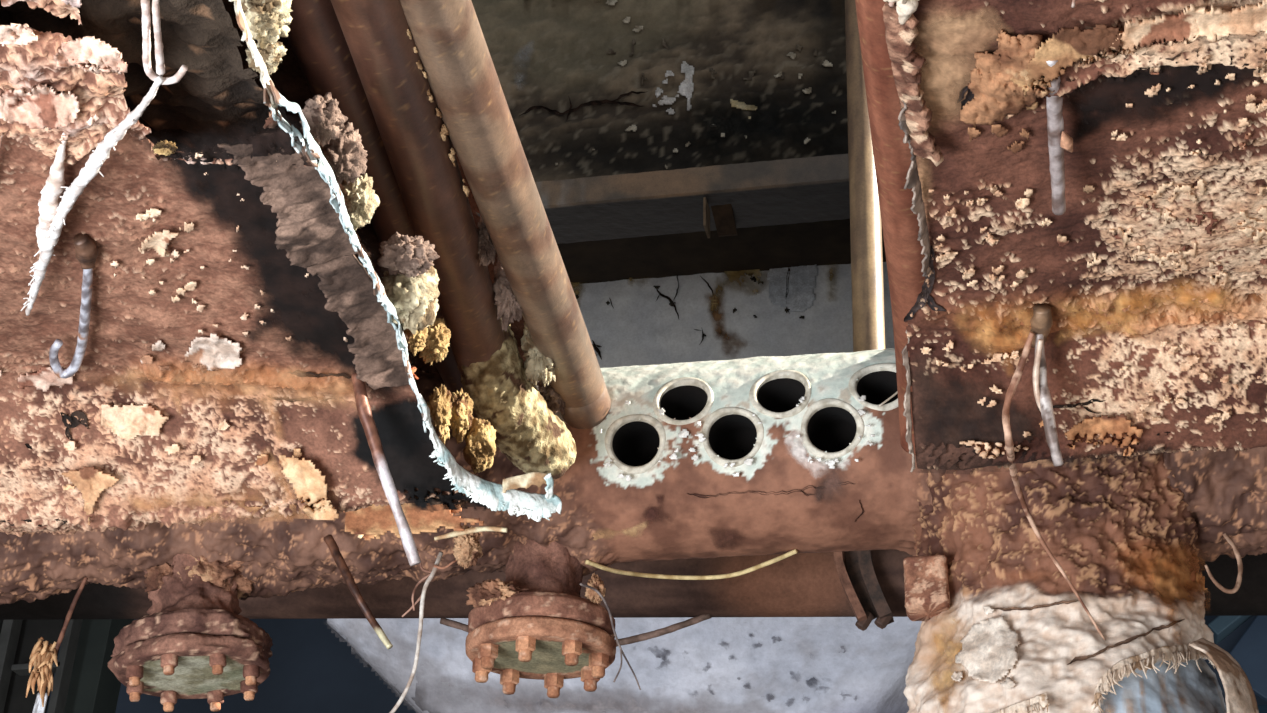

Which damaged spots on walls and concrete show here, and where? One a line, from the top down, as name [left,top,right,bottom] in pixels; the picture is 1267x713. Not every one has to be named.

peeling [1144,64,1171,97]
crack [519,91,648,123]
peeling [1224,52,1267,151]
peeling [928,185,1033,218]
peeling [962,265,1028,288]
rust [1063,286,1224,337]
rust [977,311,1031,357]
peeling [920,340,1020,372]
crack [2,519,67,527]
rust [645,497,668,522]
rust [711,530,740,547]
crack [689,482,864,521]